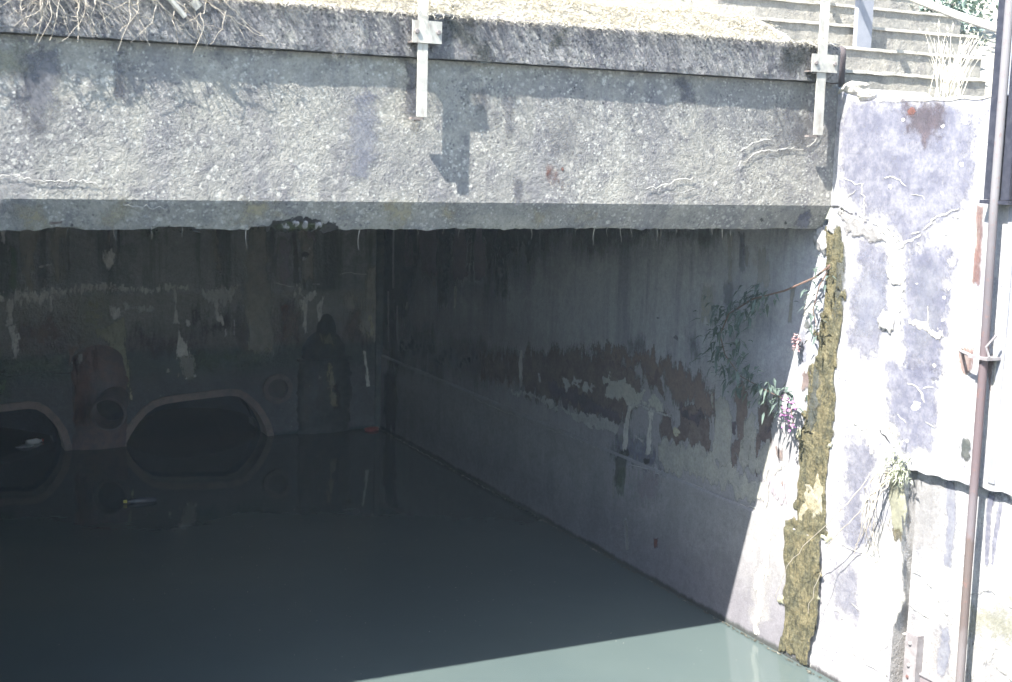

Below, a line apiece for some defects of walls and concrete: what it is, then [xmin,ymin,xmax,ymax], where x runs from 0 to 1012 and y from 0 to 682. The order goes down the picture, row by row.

damp [0,204,112,359]
damp [96,203,337,400]
damp [340,202,511,431]
damp [584,228,645,252]
damp [665,228,770,304]
damp [832,250,845,315]
crack [843,176,959,249]
corrosion [972,206,983,284]
damp [794,291,822,431]
peeling [479,341,787,508]
corrosion [961,438,971,460]